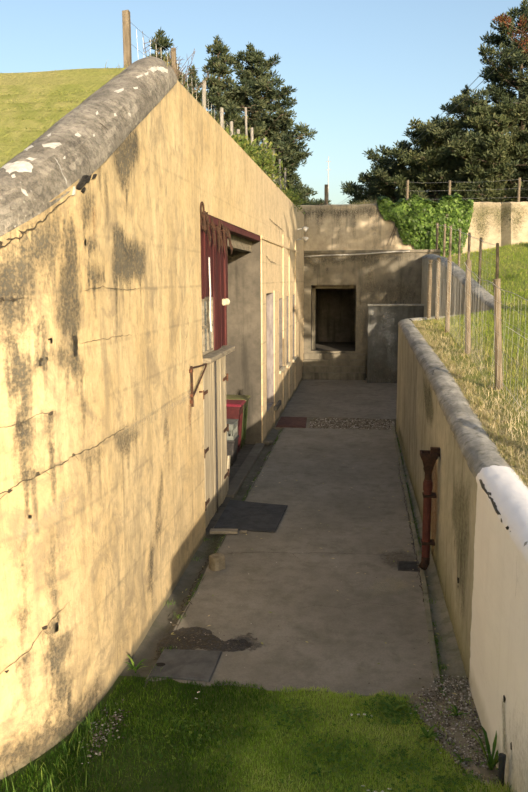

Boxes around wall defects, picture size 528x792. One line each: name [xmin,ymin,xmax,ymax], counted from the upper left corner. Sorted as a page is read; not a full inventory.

crack [0,160,73,249]
spalling [72,174,97,196]
water stain [114,128,138,188]
water stain [0,216,80,338]
water stain [88,228,145,284]
water stain [59,349,81,371]
crack [0,410,57,433]
water stain [12,346,47,482]
crack [0,426,128,499]
crack [0,608,64,674]